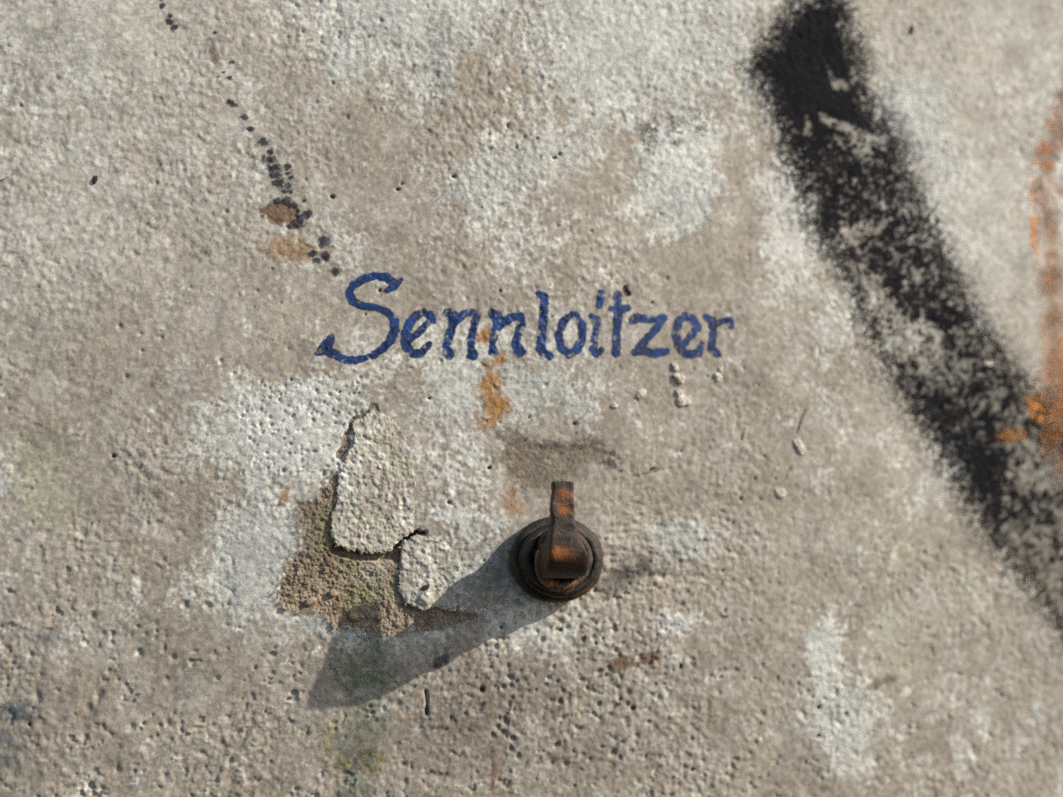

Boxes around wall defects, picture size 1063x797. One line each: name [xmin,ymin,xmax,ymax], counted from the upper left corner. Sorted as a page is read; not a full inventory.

corrosion [479,356,512,428]
spalling [272,413,478,640]